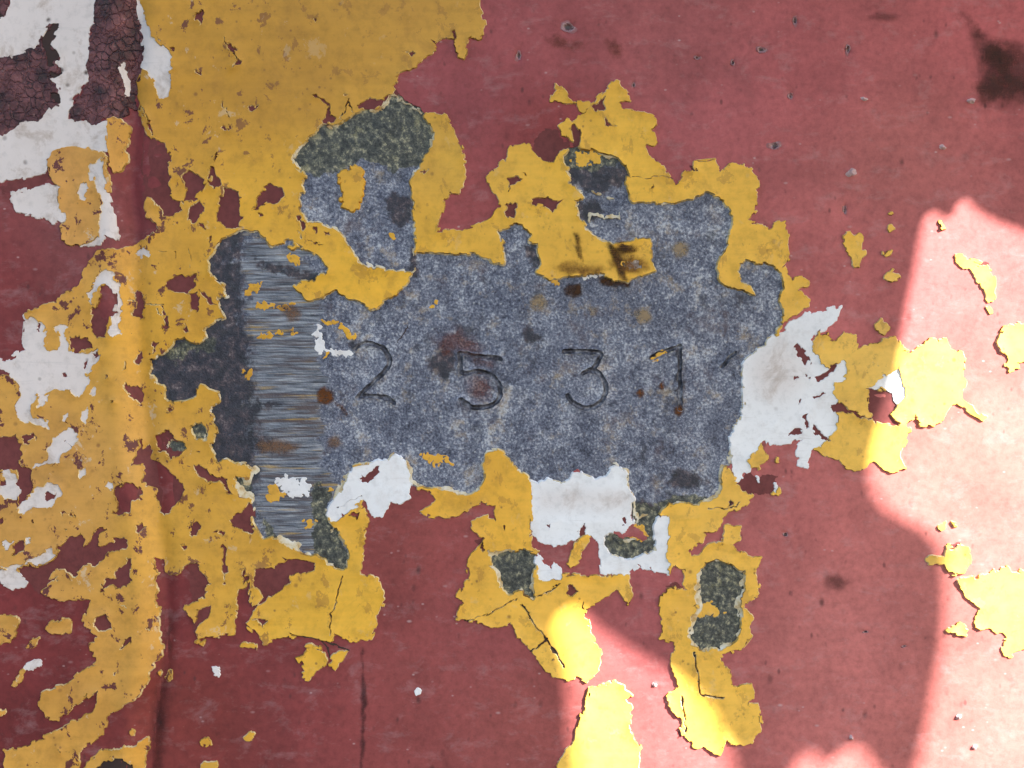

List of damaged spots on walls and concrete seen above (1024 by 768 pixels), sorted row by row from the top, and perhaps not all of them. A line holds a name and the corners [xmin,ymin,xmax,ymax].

crack [42,23,62,103]
peeling [409,79,810,337]
peeling [842,231,867,268]
peeling [0,0,487,768]
rust [317,387,347,415]
peeling [788,317,988,474]
crack [292,576,350,658]
crack [464,585,565,668]
peeling [416,448,642,768]
peeling [658,443,782,756]
peeling [924,542,1024,659]
crack [681,652,724,733]